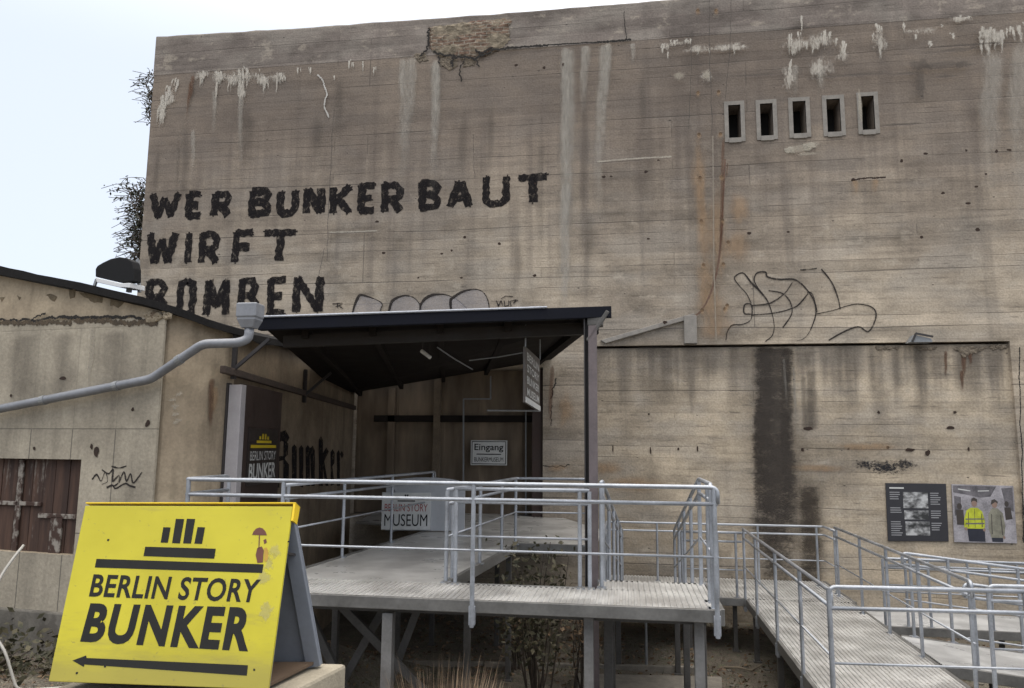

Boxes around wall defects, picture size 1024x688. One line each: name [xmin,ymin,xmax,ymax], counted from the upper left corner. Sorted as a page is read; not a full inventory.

spalling [414,18,512,71]
water stain [661,39,745,57]
water stain [785,16,880,87]
water stain [894,15,1024,94]
water stain [157,78,179,120]
water stain [196,66,335,118]
rust [696,135,744,316]
water stain [754,347,820,582]